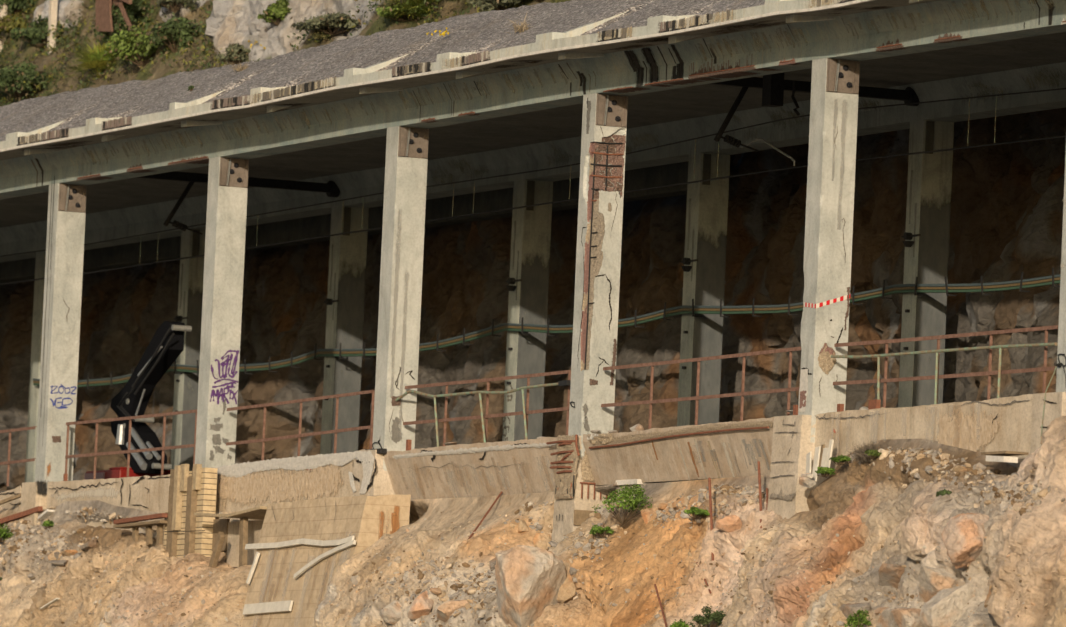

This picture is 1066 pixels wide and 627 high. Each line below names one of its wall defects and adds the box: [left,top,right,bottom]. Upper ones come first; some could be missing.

damp [513,221,550,441]
crack [577,227,612,376]
spalling [580,134,626,386]
spalling [798,343,837,413]
damp [909,183,951,407]